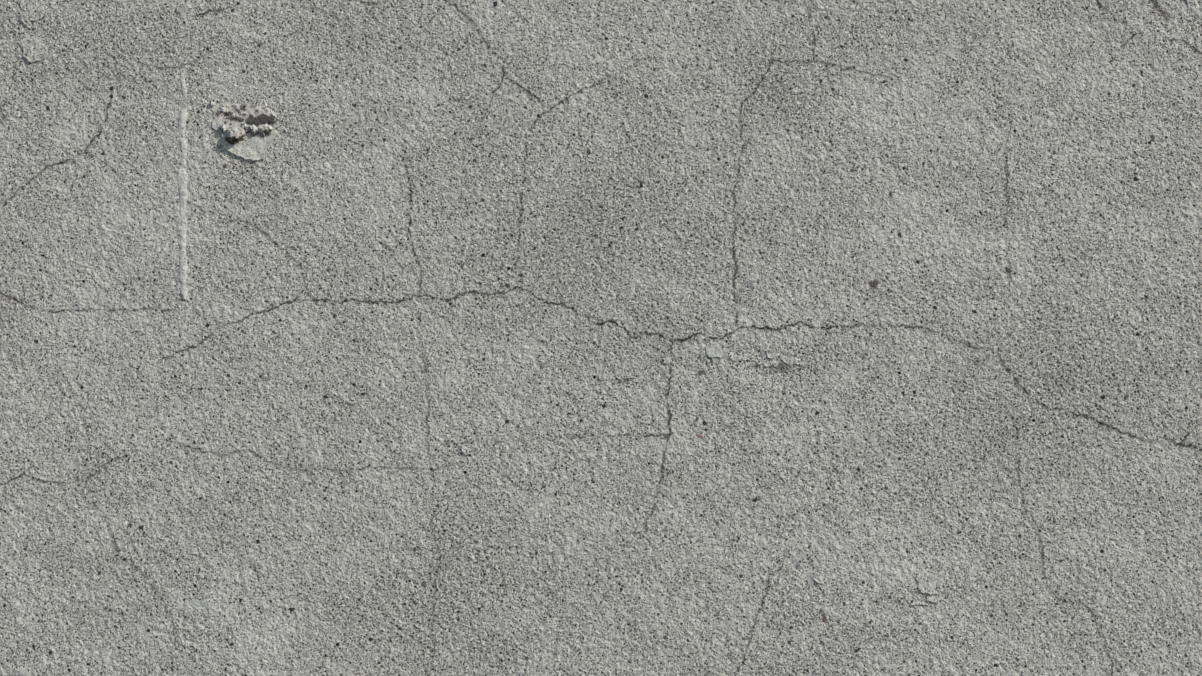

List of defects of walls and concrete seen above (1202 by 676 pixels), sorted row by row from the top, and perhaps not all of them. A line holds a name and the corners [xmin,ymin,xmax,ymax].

peeling [212,112,276,168]
crack [161,0,902,531]
crack [899,324,1202,450]